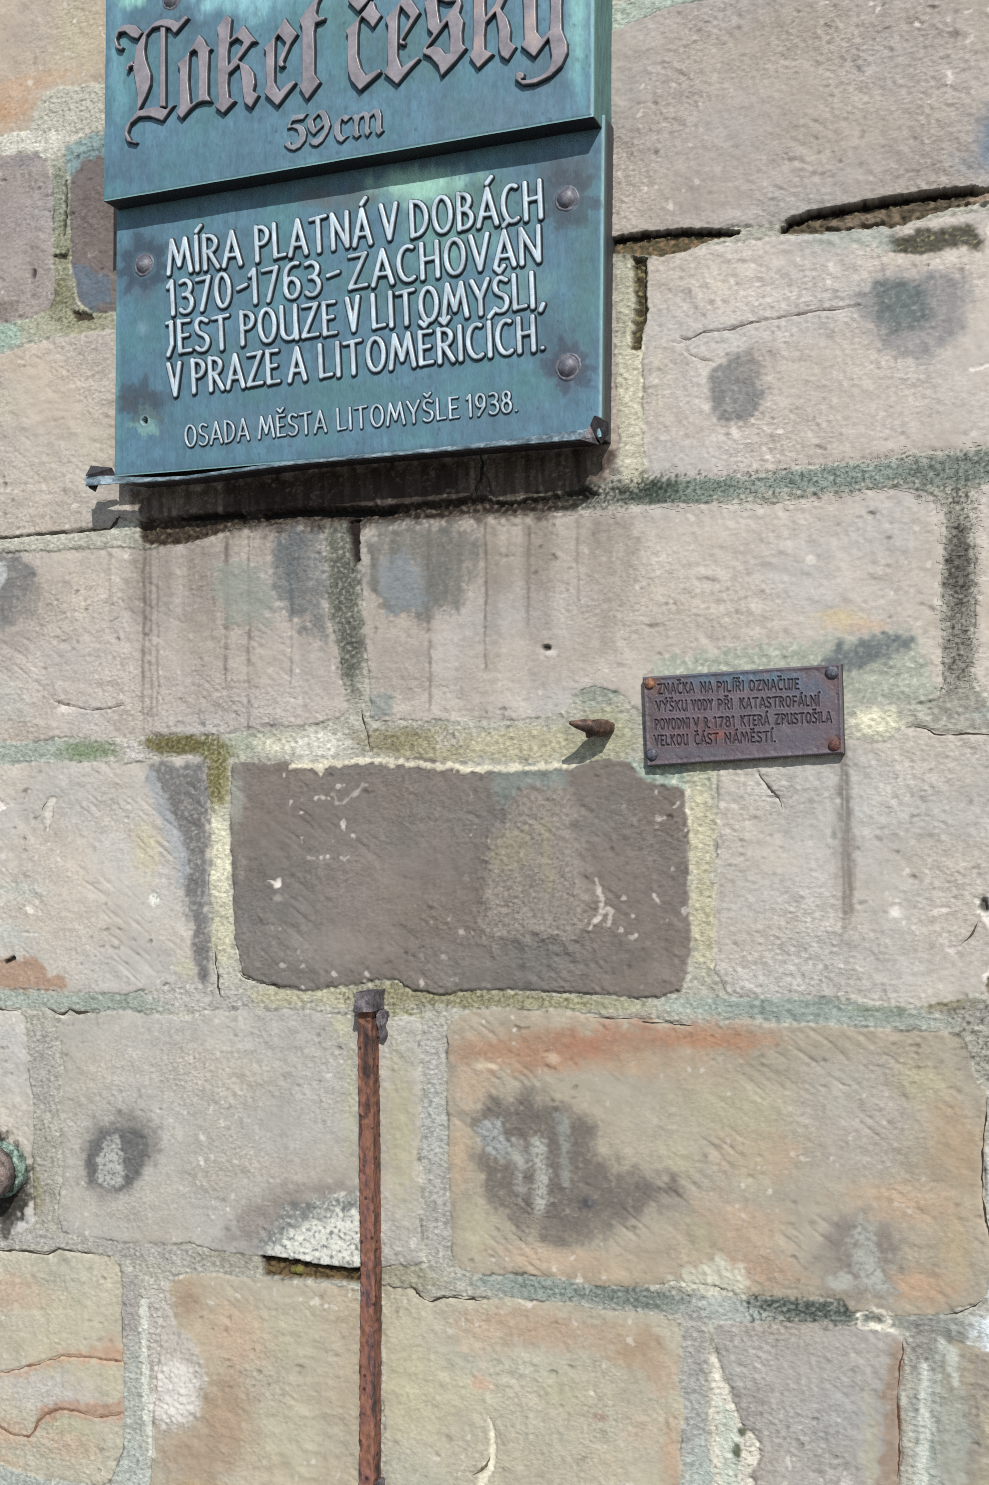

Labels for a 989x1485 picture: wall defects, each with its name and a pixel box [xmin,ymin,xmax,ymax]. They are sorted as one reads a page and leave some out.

crack [777,183,989,236]
crack [612,226,857,361]
water stain [810,225,979,368]
water stain [703,323,793,427]
water stain [141,756,219,992]
water stain [76,1102,170,1207]
water stain [454,1074,702,1259]
spalling [707,1345,765,1485]